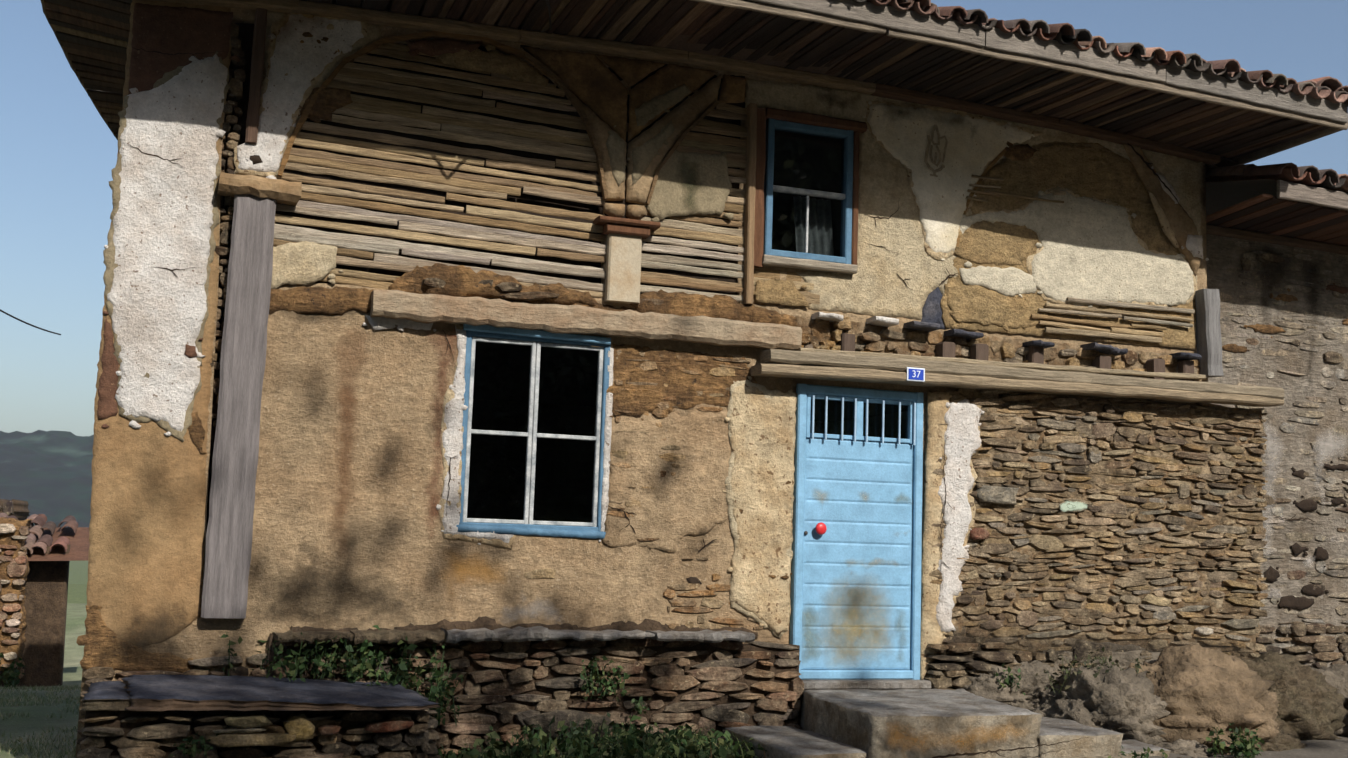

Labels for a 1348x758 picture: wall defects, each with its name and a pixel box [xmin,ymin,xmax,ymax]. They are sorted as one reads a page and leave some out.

crack [127,143,186,168]
flaking render [97,13,367,454]
flaking render [863,100,1209,343]
water stain [282,573,399,607]
flaking render [599,343,797,638]
flaking render [920,392,984,680]